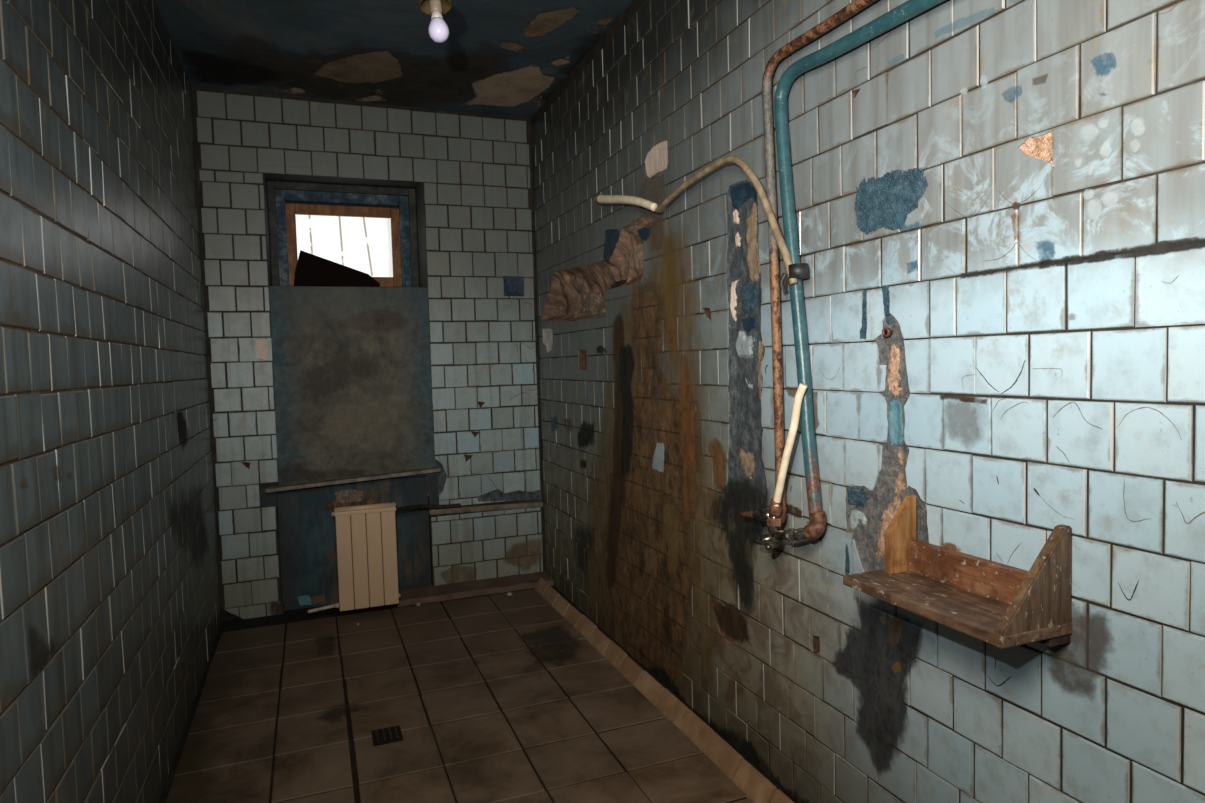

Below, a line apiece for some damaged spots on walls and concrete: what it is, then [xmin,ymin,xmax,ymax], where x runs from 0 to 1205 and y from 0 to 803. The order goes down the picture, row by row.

peeling [315,50,403,102]
peeling [459,7,581,107]
peeling [645,141,669,178]
spalling [1019,132,1054,167]
spalling [541,207,666,352]
spalling [722,180,768,542]
spalling [845,314,929,575]
corrosion [940,395,987,404]
corrosion [786,504,810,524]
water stain [833,600,921,771]